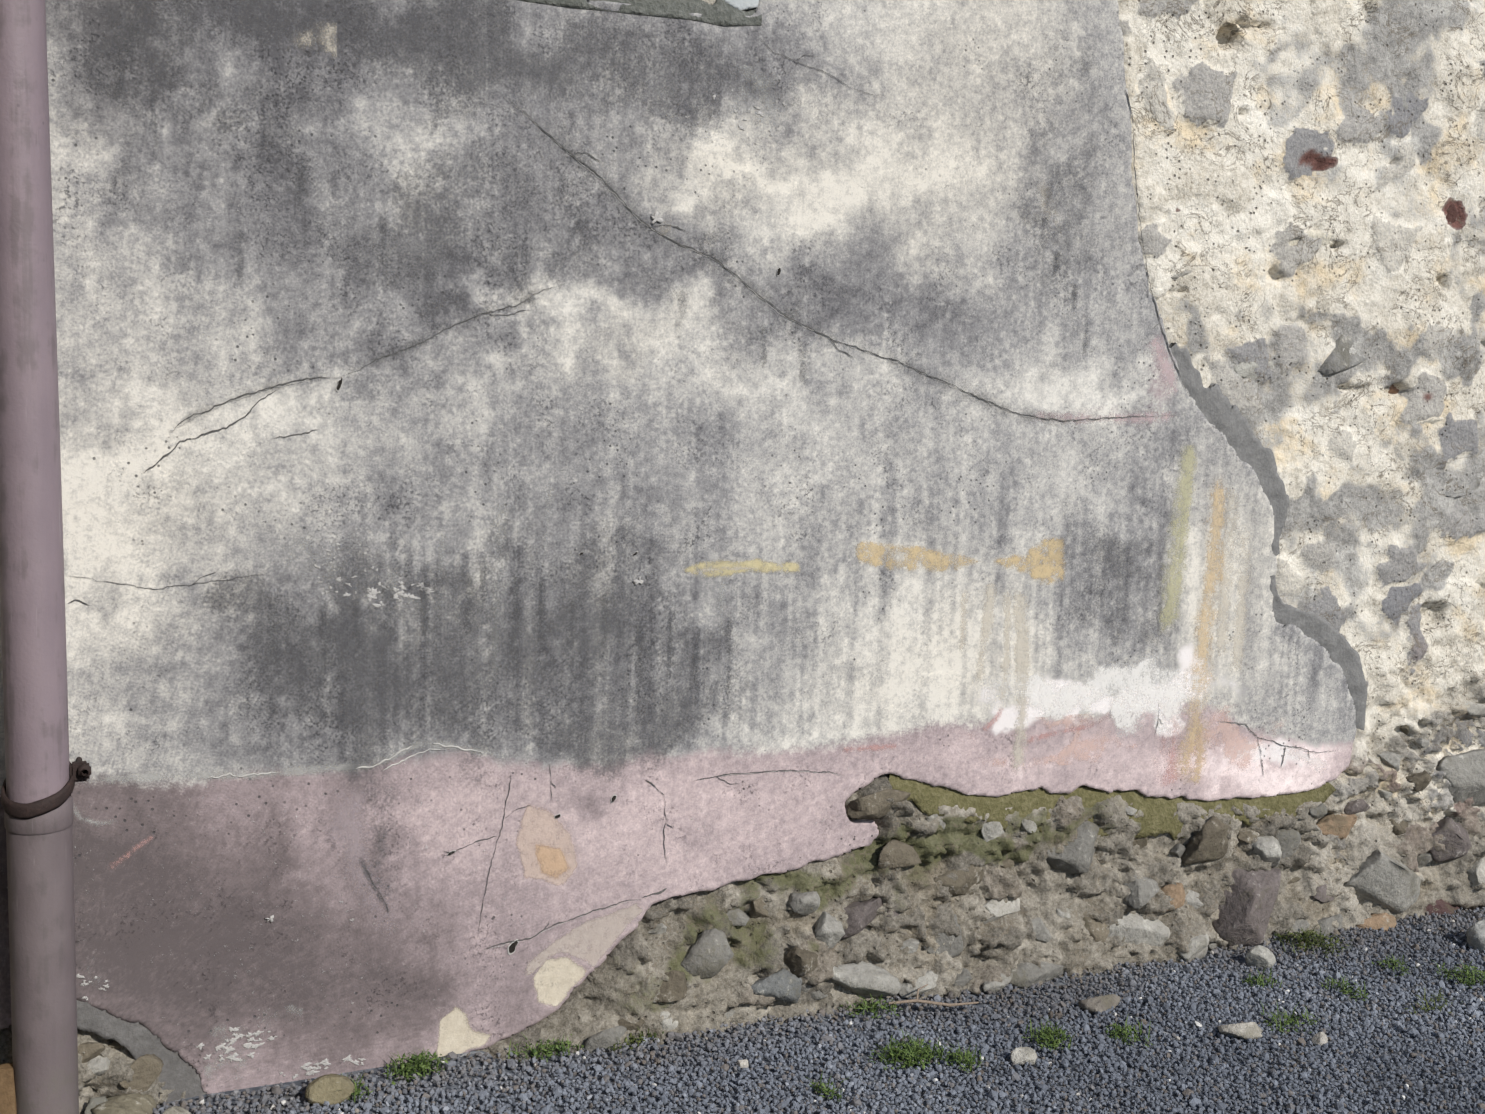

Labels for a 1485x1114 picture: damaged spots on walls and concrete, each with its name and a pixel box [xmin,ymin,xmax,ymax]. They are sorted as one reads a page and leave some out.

water stain [343,2,630,93]
flaking render [518,0,762,26]
crack [504,90,1188,422]
crack [142,283,565,474]
water stain [288,564,690,775]
water stain [960,585,1106,767]
crack [445,763,672,950]
crack [698,770,842,784]
flaking render [437,652,1485,1062]
flaking render [0,1025,13,1065]
flaking render [76,974,277,1114]